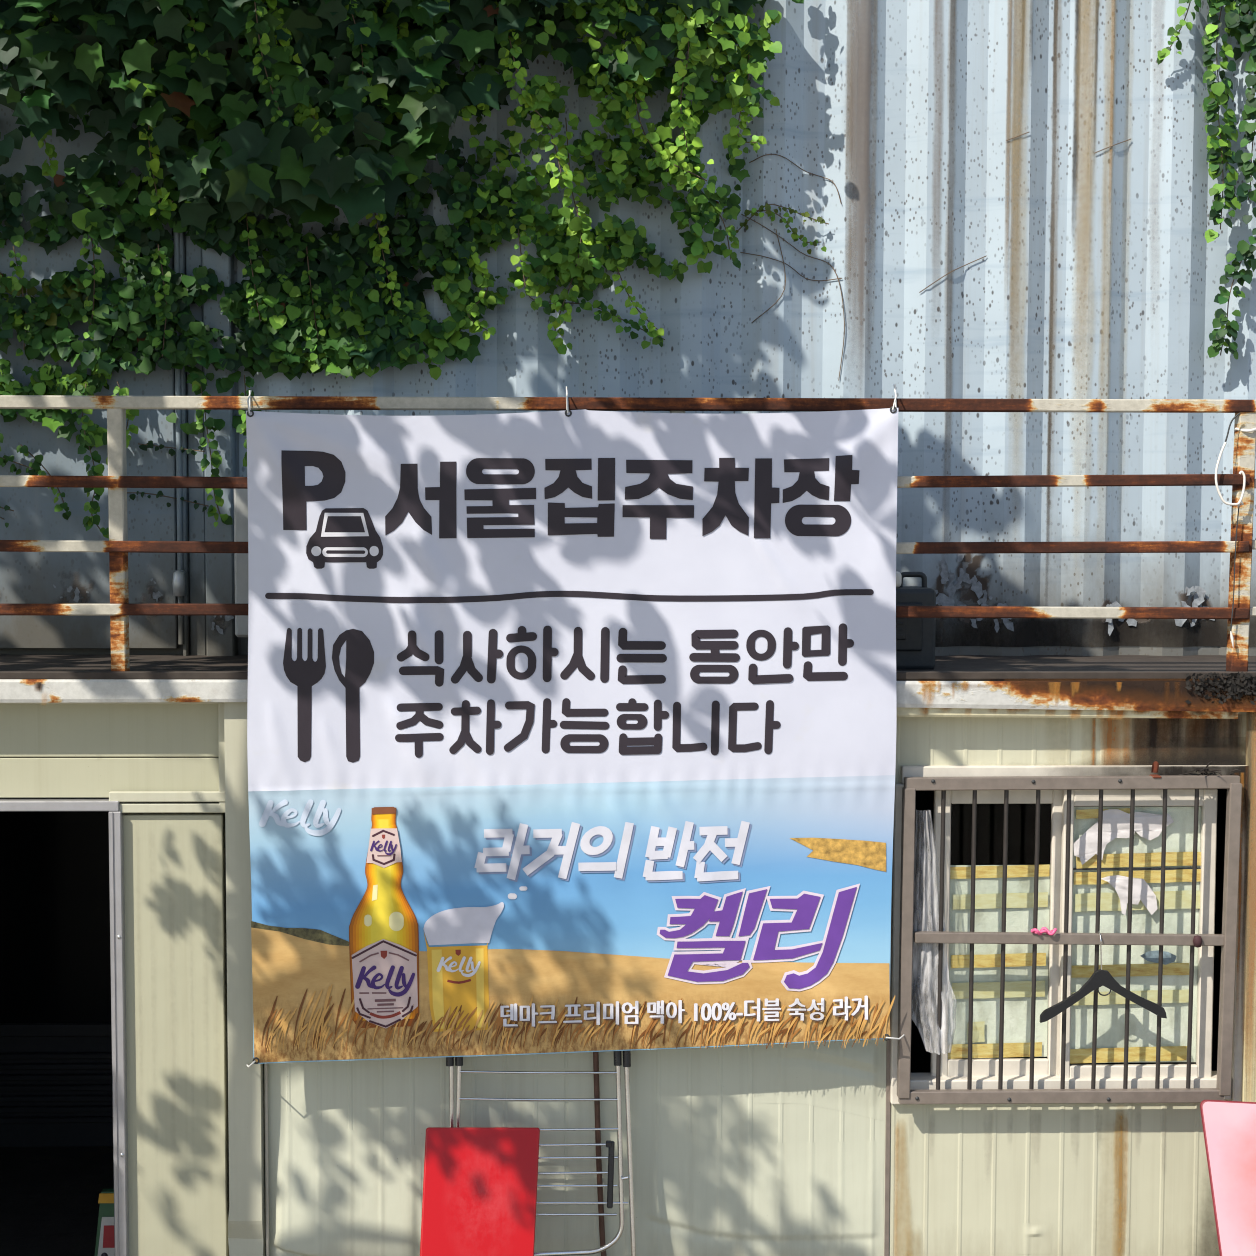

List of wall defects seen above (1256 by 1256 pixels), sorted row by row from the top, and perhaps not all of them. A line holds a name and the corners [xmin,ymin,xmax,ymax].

peeling [935,554,1014,632]
peeling [1102,600,1150,636]
peeling [1175,586,1215,627]
corrosion [1019,680,1256,1035]